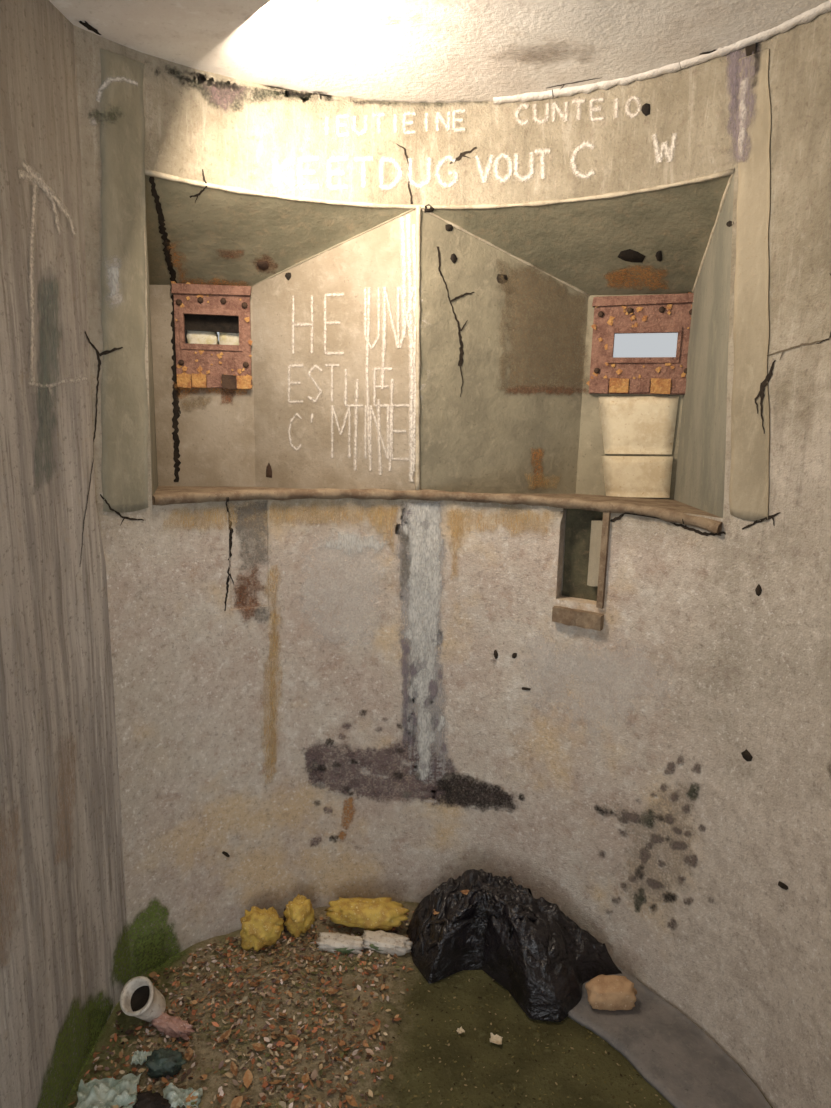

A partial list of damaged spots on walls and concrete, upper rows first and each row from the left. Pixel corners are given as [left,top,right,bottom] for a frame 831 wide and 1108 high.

leakage [156,68,331,110]
leakage [727,44,760,161]
crack [437,247,474,397]
crack [754,332,831,434]
leakage [302,502,524,813]